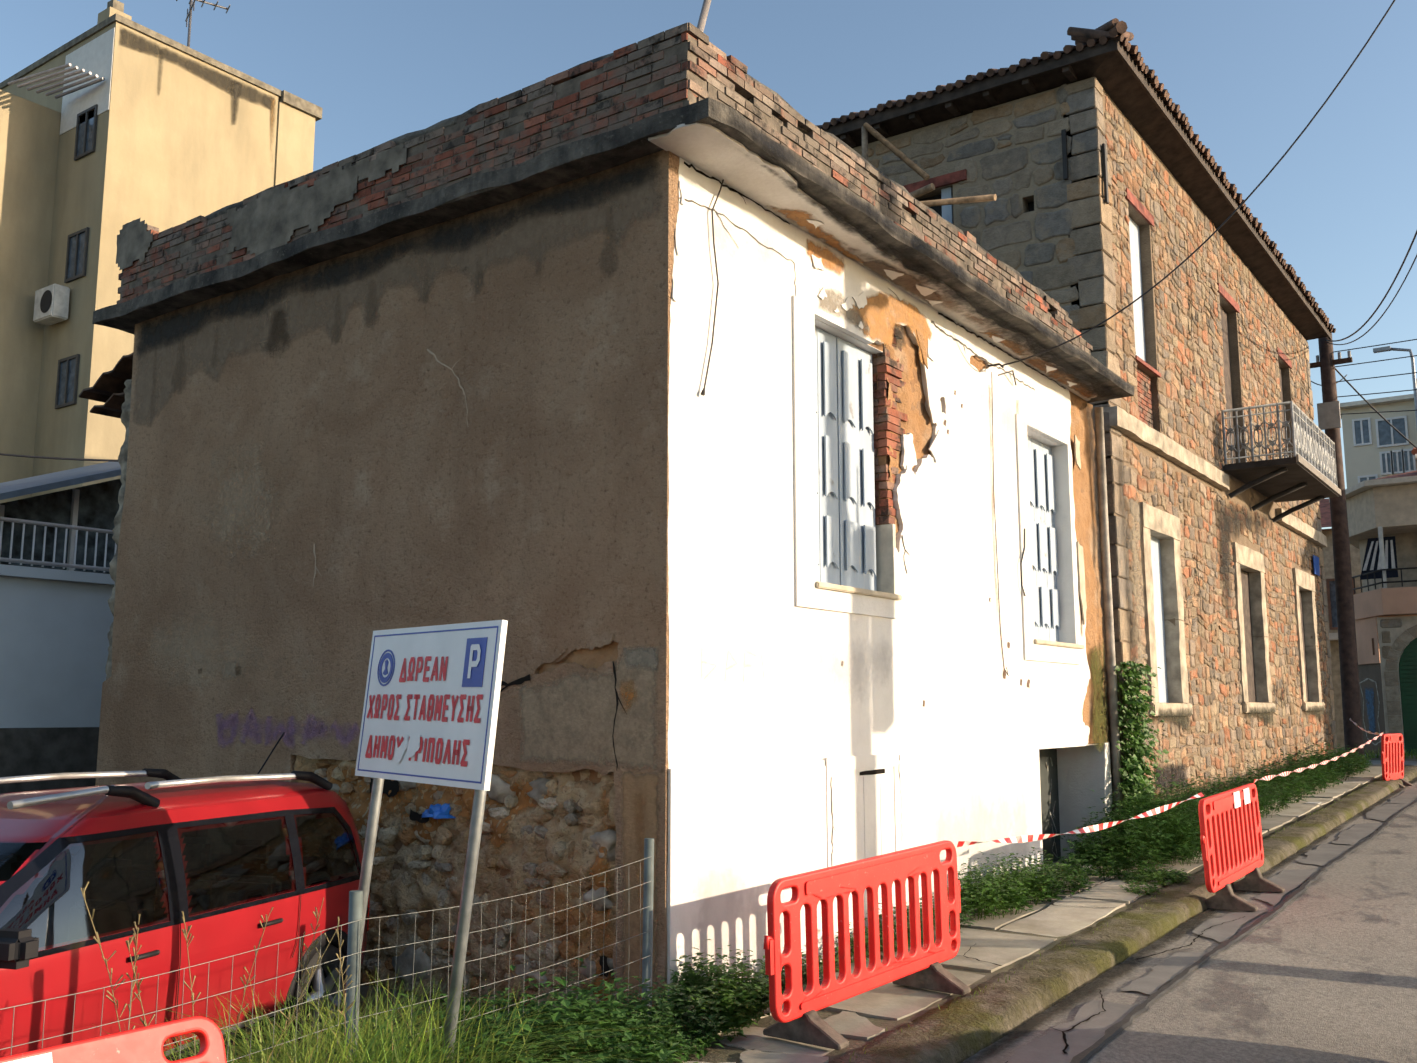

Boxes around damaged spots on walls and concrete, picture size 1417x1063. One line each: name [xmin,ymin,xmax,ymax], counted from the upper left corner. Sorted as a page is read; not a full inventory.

water stain [120,29,275,130]
crack [679,162,796,287]
water stain [134,166,659,423]
spalling [772,207,963,534]
spalling [970,356,986,371]
crack [500,674,530,693]
crack [612,661,627,767]
spalling [294,755,618,1013]
crack [1039,989,1106,1054]